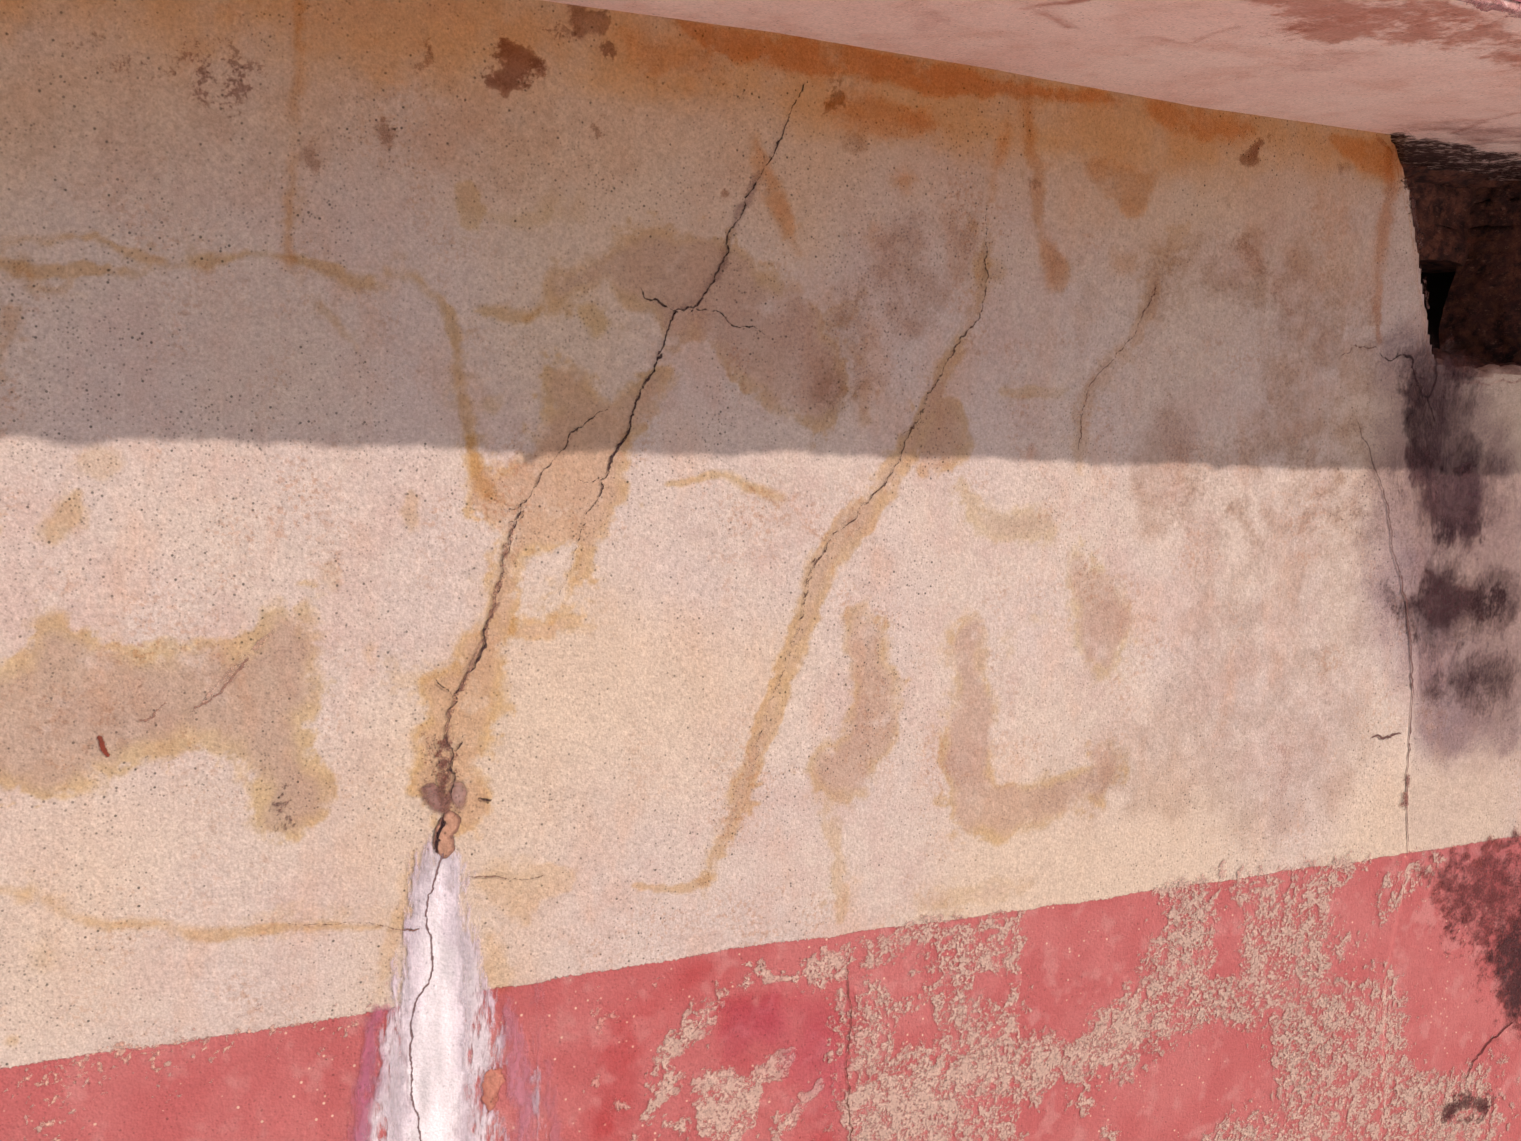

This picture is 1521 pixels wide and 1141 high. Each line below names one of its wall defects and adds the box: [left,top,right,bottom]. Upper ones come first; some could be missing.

crack [755,208,989,760]
crack [1342,345,1438,437]
spalling [1421,272,1456,349]
damp [1405,357,1483,544]
damp [97,736,110,757]
crack [289,81,808,1141]
crack [1359,426,1414,855]
damp [1398,568,1516,640]
damp [1449,661,1512,698]
damp [354,842,539,1141]
peeling [611,845,1520,1141]
damp [1420,831,1521,1029]